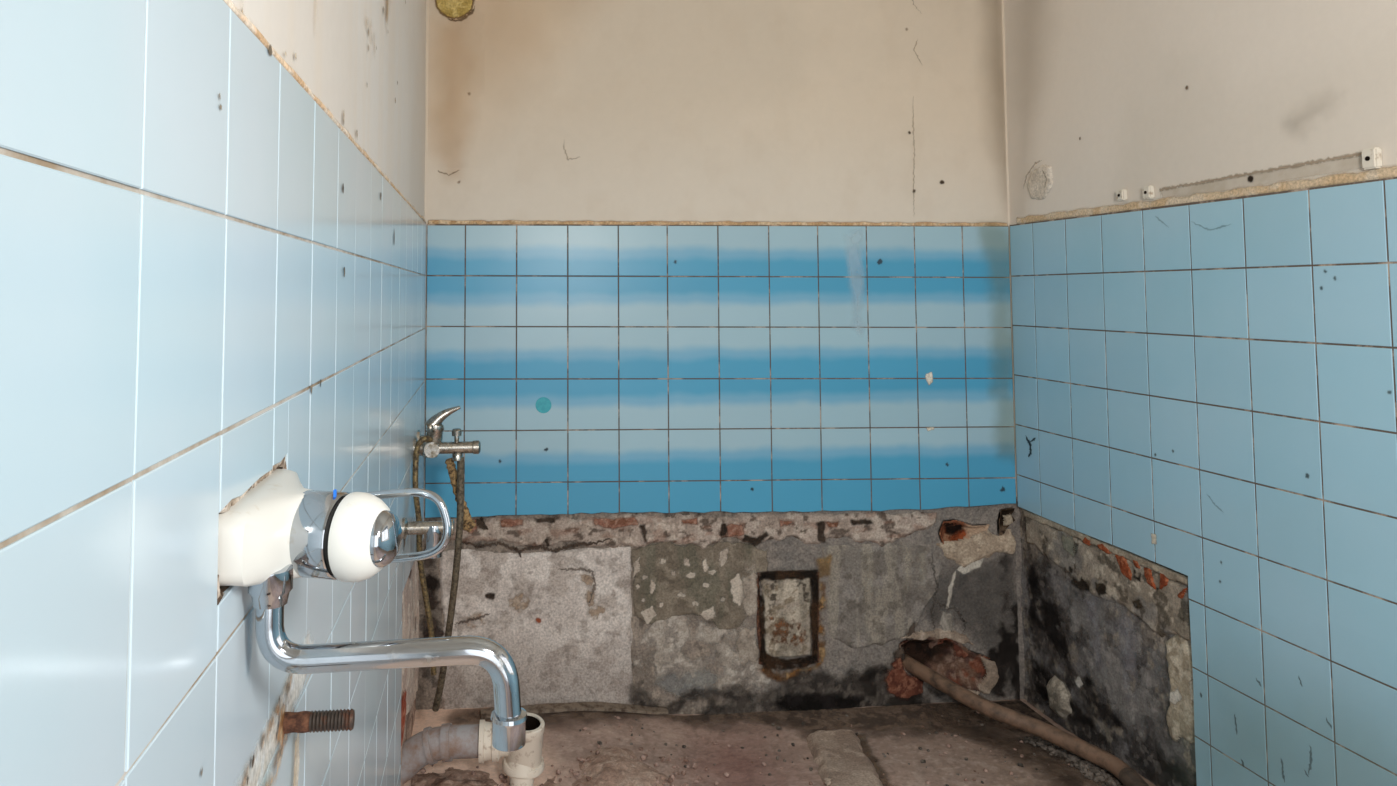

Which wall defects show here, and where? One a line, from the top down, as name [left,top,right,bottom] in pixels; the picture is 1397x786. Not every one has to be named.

peeling [501,519,523,527]
peeling [581,574,605,619]
peeling [593,517,638,529]
peeling [631,523,768,666]
flaking render [822,520,999,699]
leakage [927,549,1197,786]
spalling [1023,509,1191,641]
peeling [1170,680,1194,704]